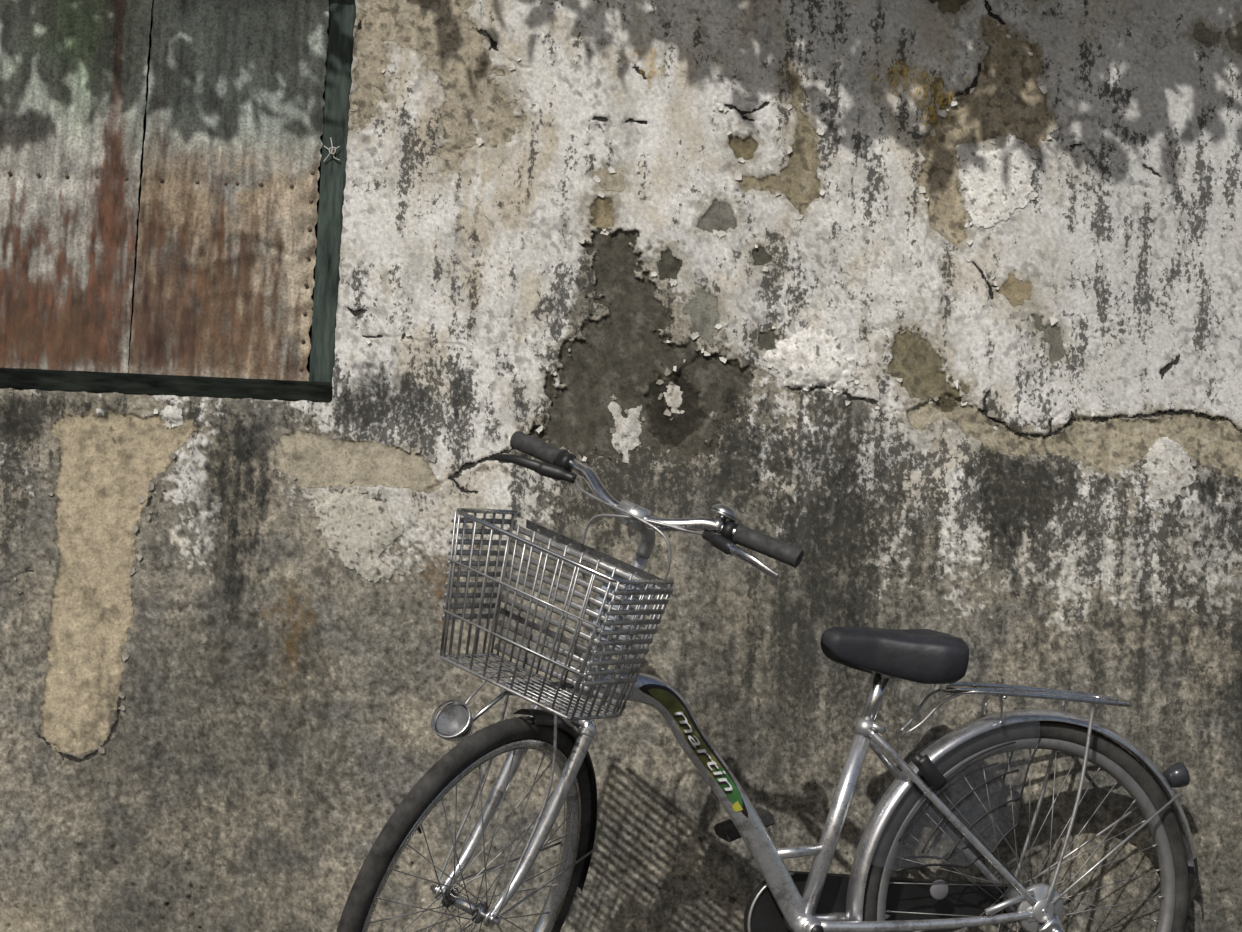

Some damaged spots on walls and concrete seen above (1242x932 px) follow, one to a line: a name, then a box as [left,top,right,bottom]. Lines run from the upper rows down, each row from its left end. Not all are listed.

peeling [727,73,826,220]
peeling [917,18,1053,246]
peeling [41,409,204,754]
corrosion [0,127,304,380]
water stain [193,411,278,622]
crack [448,424,541,493]
flaking render [531,166,756,465]
flaking render [757,325,779,354]
crack [788,382,880,410]
peeling [887,327,1242,478]
crack [977,390,1242,439]
water stain [1197,460,1240,541]